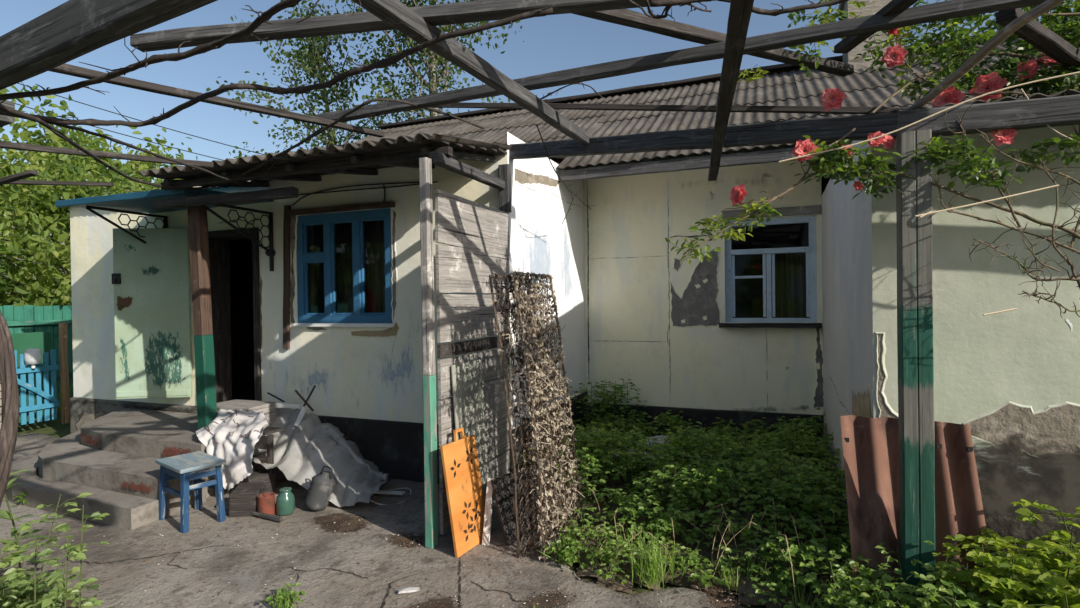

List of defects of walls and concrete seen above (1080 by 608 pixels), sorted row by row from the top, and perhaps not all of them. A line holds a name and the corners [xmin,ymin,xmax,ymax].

spalling [513,167,561,189]
spalling [670,246,722,328]
spalling [851,332,898,419]
spalling [962,401,1080,456]